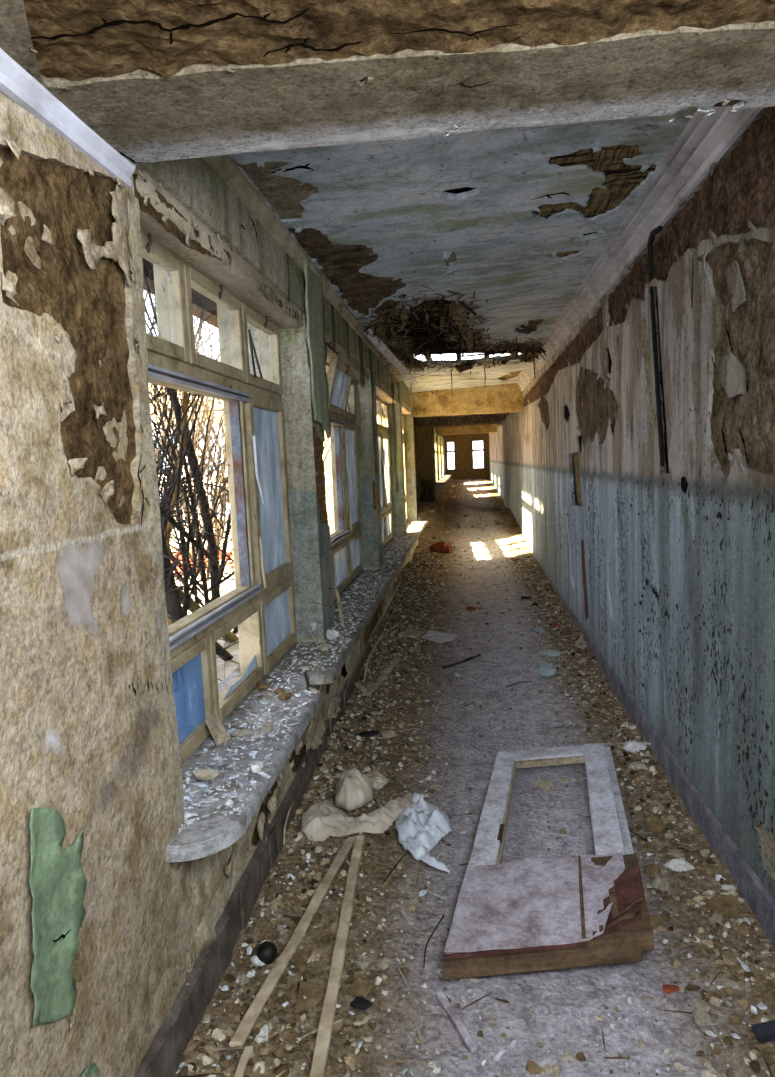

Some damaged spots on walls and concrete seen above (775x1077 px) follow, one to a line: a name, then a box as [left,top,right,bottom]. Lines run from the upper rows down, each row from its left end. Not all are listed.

crack [31,8,362,56]
crack [389,24,519,41]
spalling [669,99,742,122]
flaking render [237,161,407,320]
flaking render [524,106,775,479]
flaking render [0,137,233,525]
flaking render [515,319,547,338]
peeling [29,807,87,1030]
peeling [80,1062,100,1077]